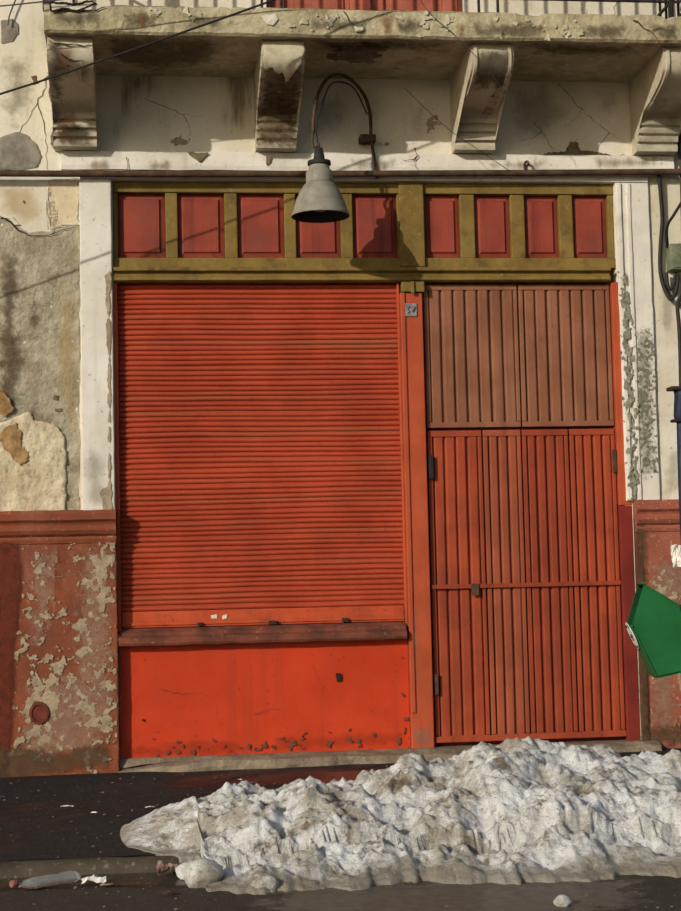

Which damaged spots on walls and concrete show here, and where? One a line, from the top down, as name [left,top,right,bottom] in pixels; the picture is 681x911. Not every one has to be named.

water stain [49,40,61,99]
water stain [58,124,91,144]
water stain [109,40,217,70]
water stain [256,56,305,147]
water stain [476,51,509,114]
crack [520,83,629,156]
water stain [0,259,21,404]
flaking render [0,178,81,510]
water stain [630,330,658,477]
peeling [652,561,681,601]
peeling [8,536,120,774]
peeling [651,673,681,730]